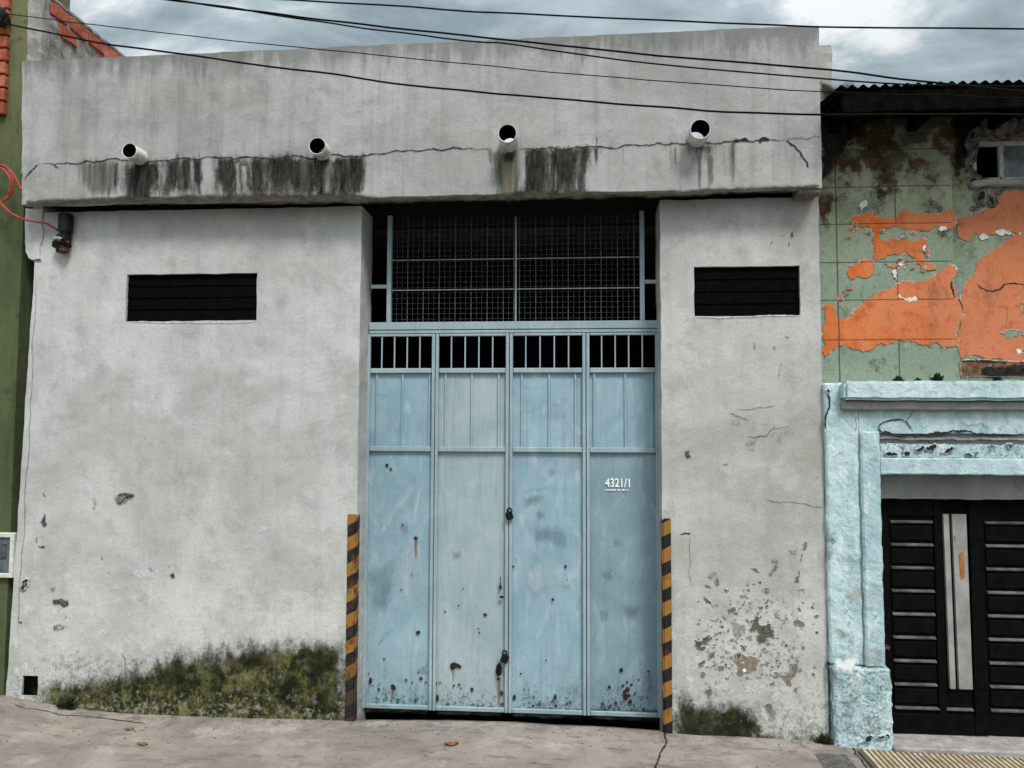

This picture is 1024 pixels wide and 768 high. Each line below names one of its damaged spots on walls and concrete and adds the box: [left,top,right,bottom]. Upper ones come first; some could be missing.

leakage [83,155,202,198]
crack [25,147,493,178]
leakage [215,154,365,195]
leakage [490,145,598,194]
crack [523,135,819,167]
leakage [820,82,851,180]
peeling [821,117,1024,379]
crack [855,411,1022,438]
peeling [884,443,1013,458]
peeling [694,541,819,711]
corrosion [368,662,580,720]
corrosion [600,668,651,719]